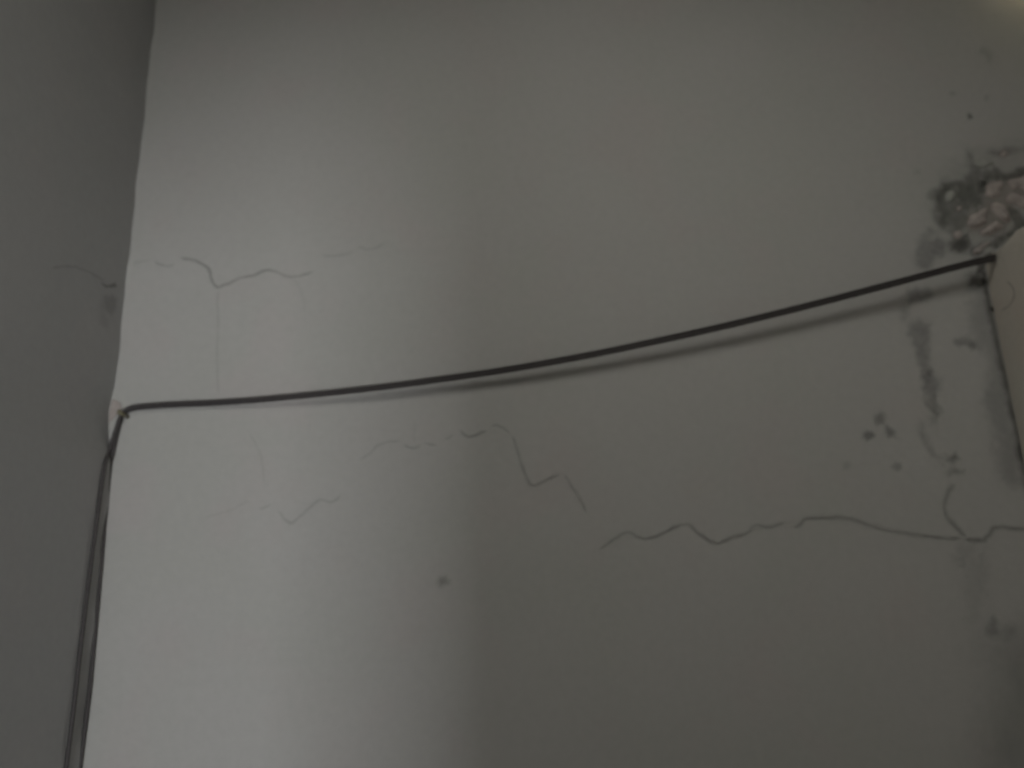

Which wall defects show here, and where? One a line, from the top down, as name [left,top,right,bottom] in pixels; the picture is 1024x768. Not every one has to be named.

flaking render [943,175,1024,255]